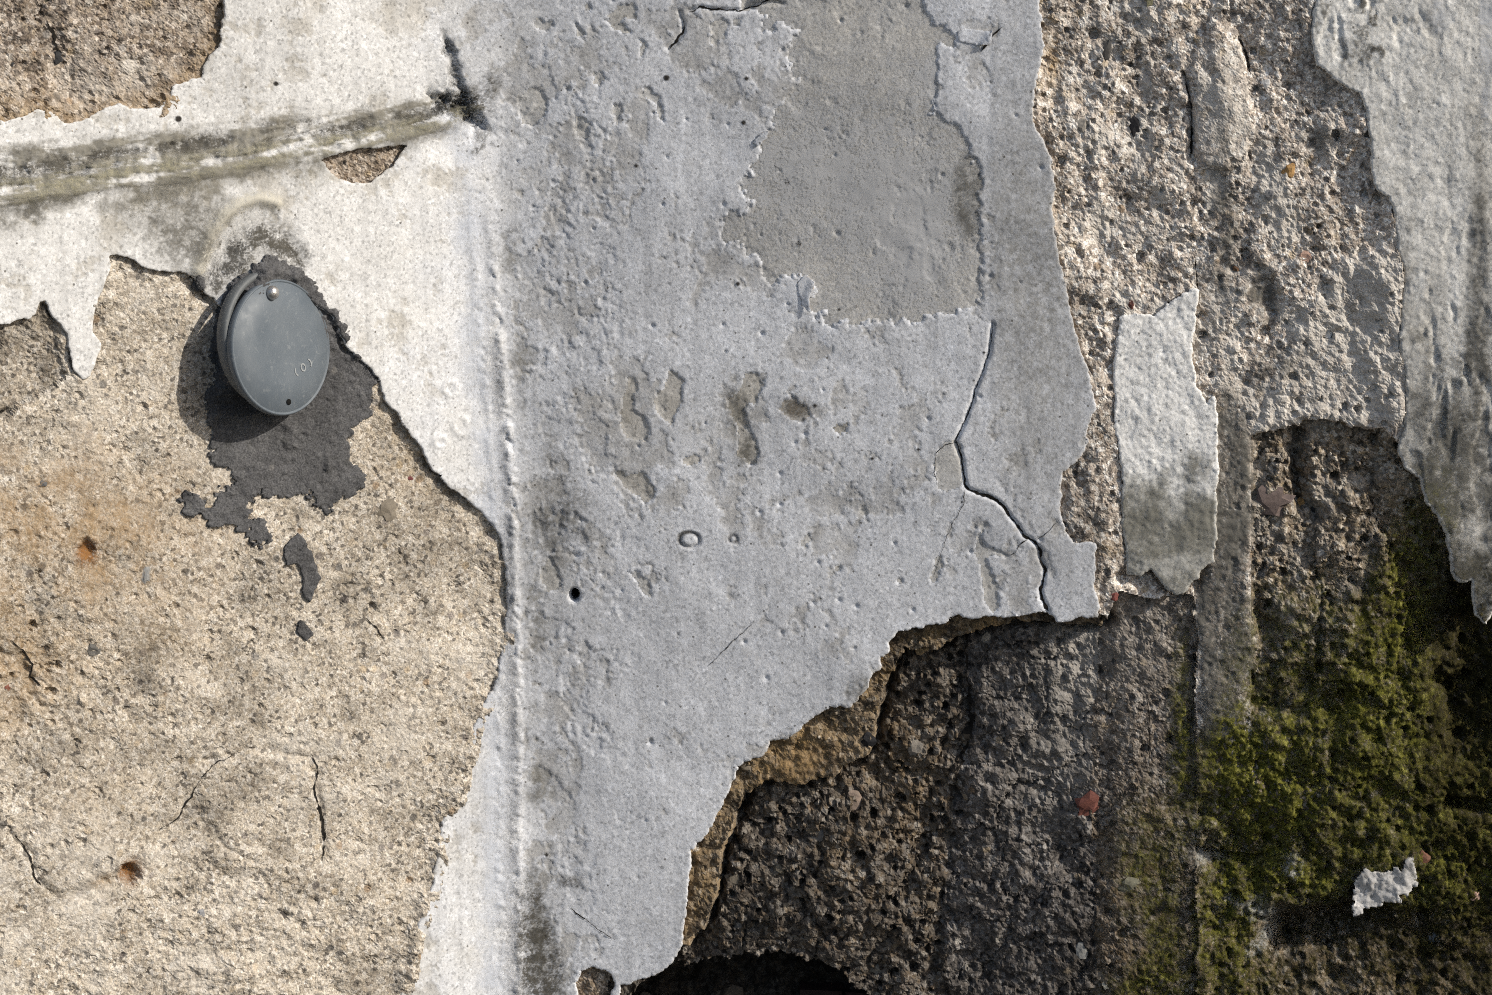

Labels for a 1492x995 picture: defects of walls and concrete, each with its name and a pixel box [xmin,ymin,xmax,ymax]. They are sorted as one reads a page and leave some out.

spalling [0,0,223,135]
spalling [322,145,404,183]
corrosion [78,541,96,564]
spalling [0,255,515,995]
crack [933,326,1055,610]
spalling [574,0,1492,995]
water stain [1122,393,1254,746]
crack [0,835,41,885]
corrosion [120,861,139,881]
crack [160,754,234,830]
crack [311,754,326,861]
water stain [1242,631,1486,909]